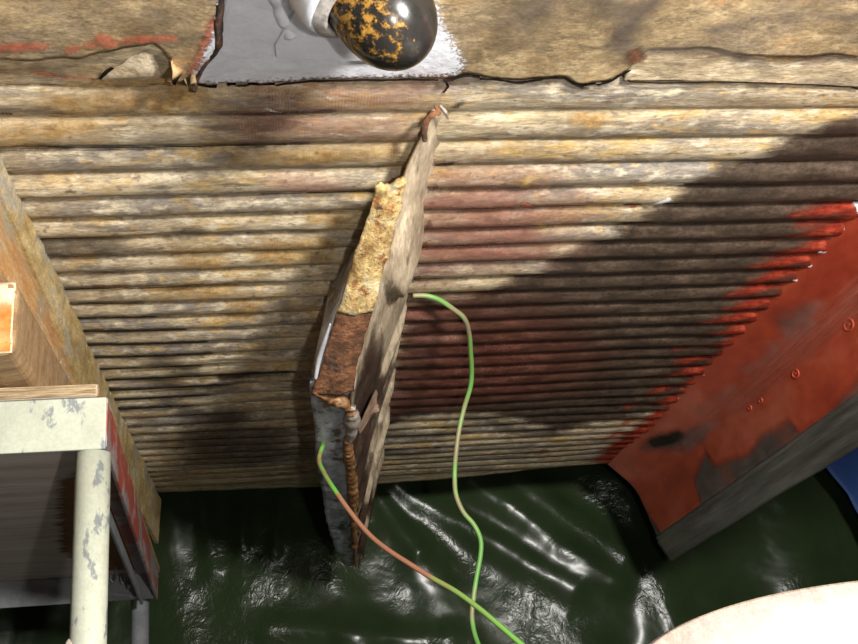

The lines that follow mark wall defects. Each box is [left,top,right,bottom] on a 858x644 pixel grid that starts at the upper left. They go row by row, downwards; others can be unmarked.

crack [198,69,858,93]
spalling [314,323,331,380]
rust [343,333,399,567]
water stain [386,117,858,461]